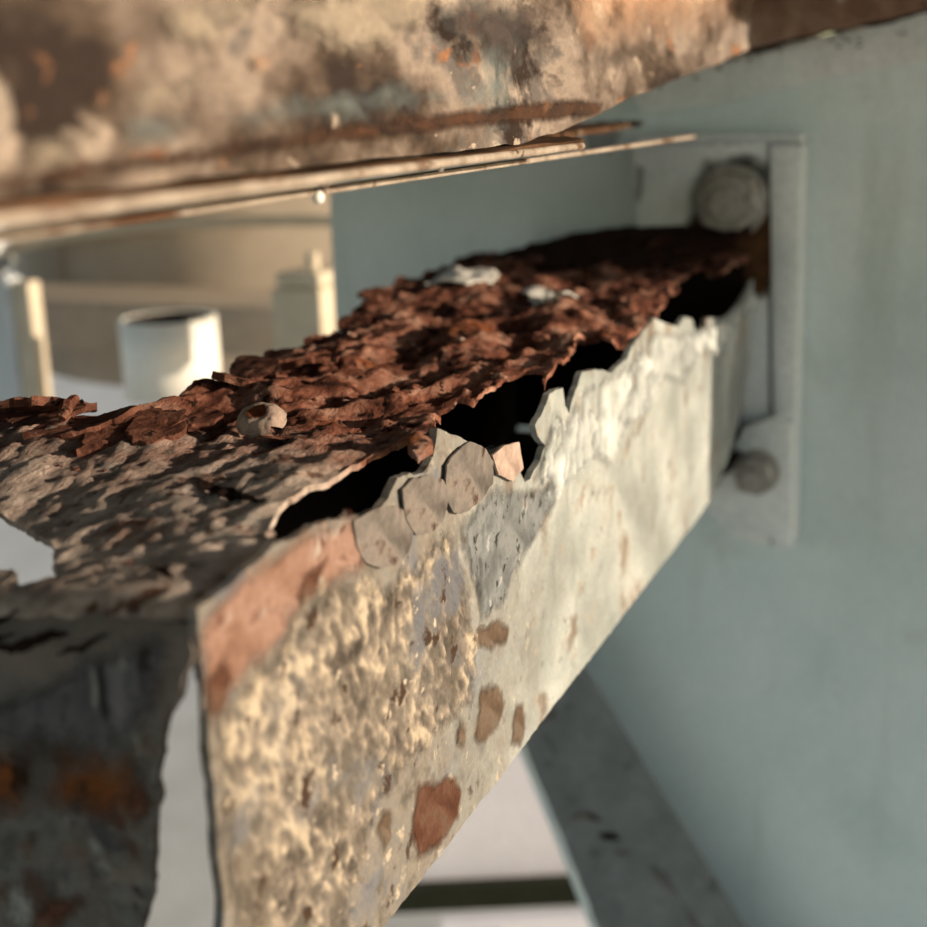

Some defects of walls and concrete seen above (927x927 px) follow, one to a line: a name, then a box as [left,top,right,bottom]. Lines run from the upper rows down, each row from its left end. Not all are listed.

corrosion [728,214,772,298]
corrosion [357,276,435,300]
corrosion [337,312,411,340]
corrosion [211,347,362,388]
corrosion [0,396,224,457]
peeling [462,292,756,619]
corrosion [476,620,509,650]
corrosion [458,685,504,747]
corrosion [512,705,525,746]
corrosion [413,777,462,856]